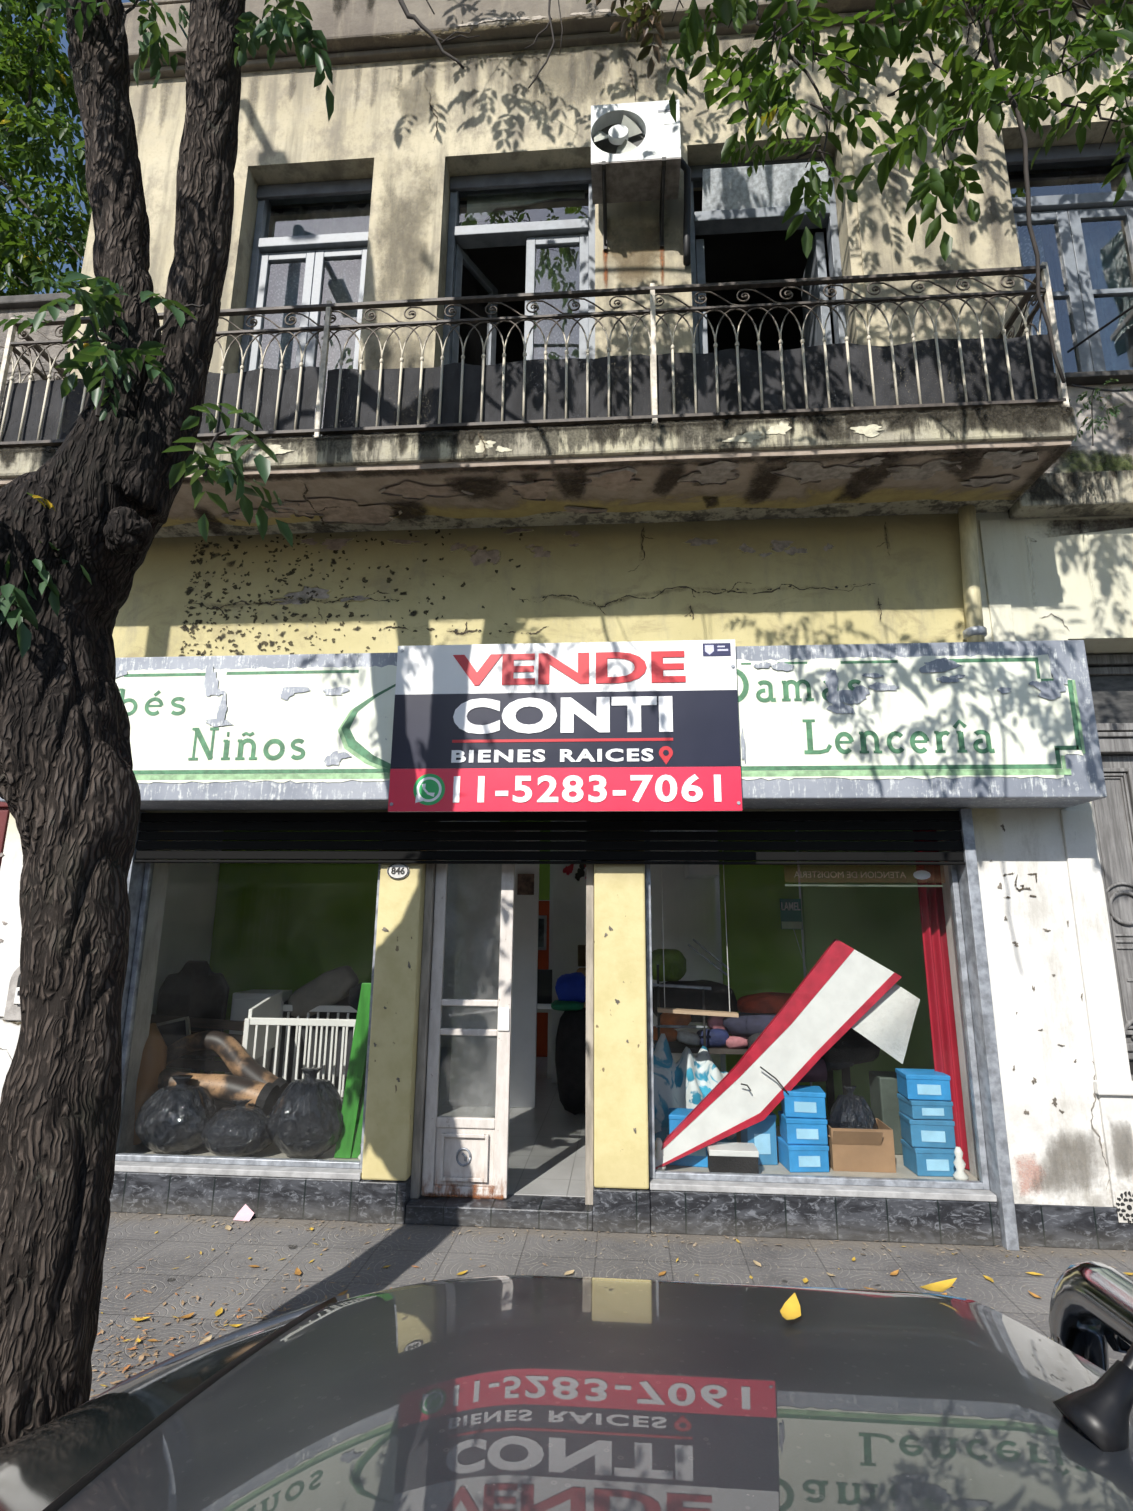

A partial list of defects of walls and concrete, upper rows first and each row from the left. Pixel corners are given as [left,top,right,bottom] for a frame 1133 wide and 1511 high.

damp [603,227,664,283]
damp [0,446,58,467]
damp [196,404,1078,508]
damp [1050,518,1133,535]
damp [178,502,453,657]
crack [450,522,888,635]
peeling [204,664,233,727]
peeling [280,687,350,700]
peeling [825,668,899,714]
peeling [919,658,965,683]
peeling [1028,670,1068,700]
damp [1115,1128,1133,1172]